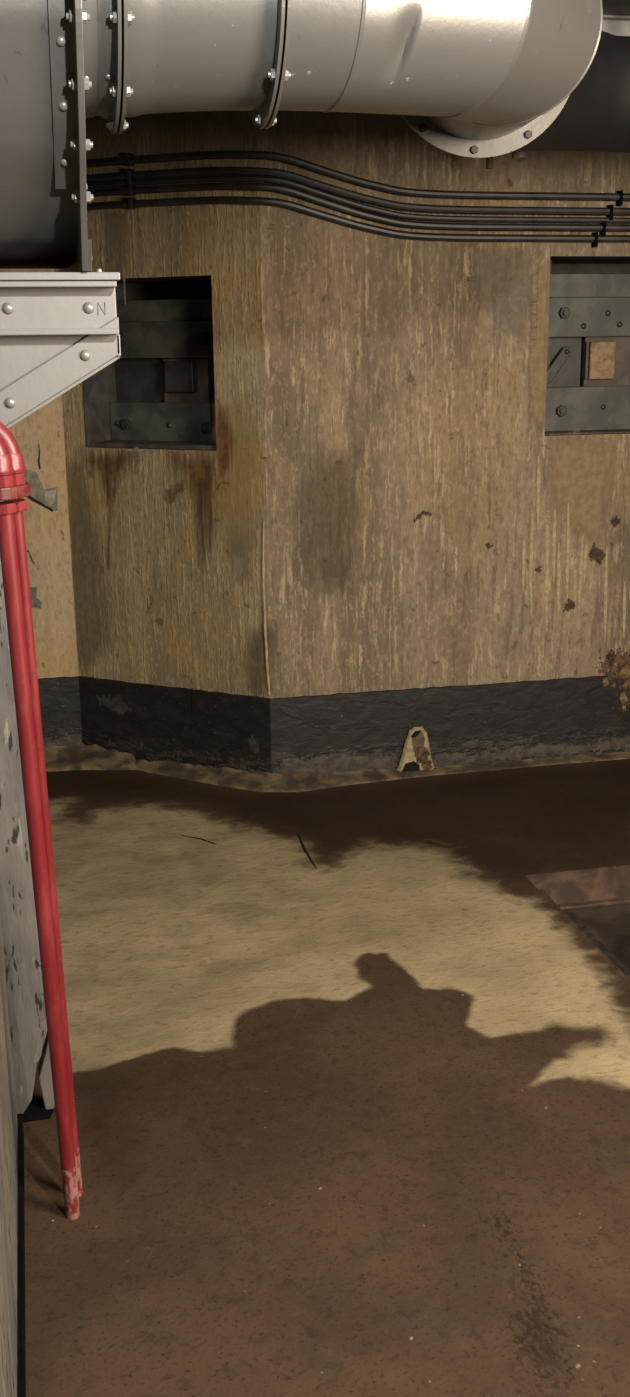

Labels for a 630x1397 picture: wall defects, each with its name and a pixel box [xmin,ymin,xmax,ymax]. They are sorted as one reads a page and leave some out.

rust [86,450,139,493]
rust [174,407,232,545]
peeling [30,587,42,609]